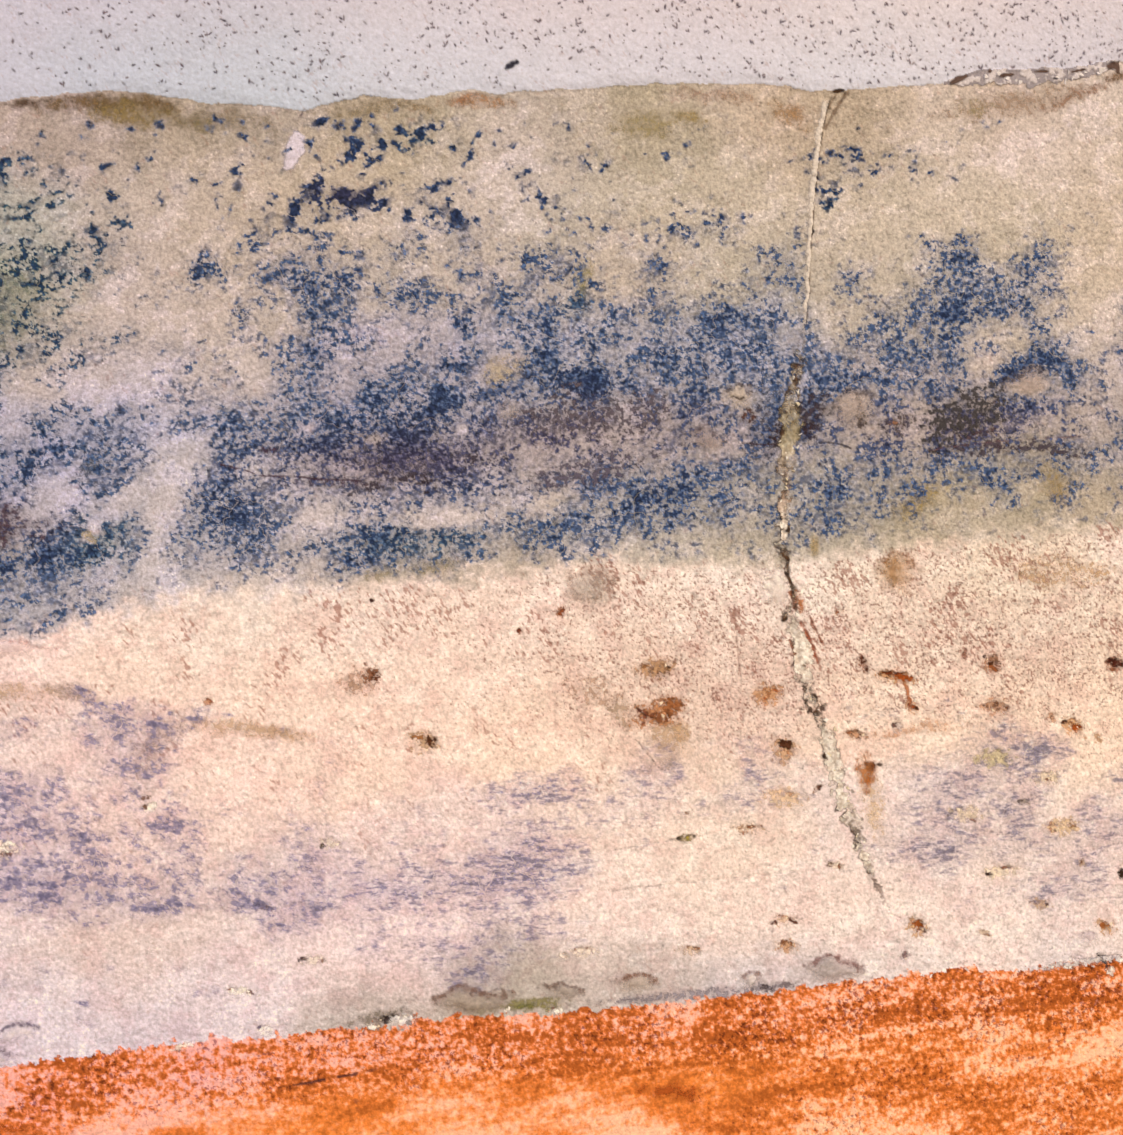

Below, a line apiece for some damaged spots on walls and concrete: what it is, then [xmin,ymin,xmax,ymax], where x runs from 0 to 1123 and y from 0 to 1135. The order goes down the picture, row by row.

peeling [944,60,1120,89]
water stain [15,94,269,142]
water stain [456,93,504,107]
crack [803,89,845,323]
water stain [0,102,1123,635]
crack [742,357,879,886]
corrosion [637,1083,695,1102]